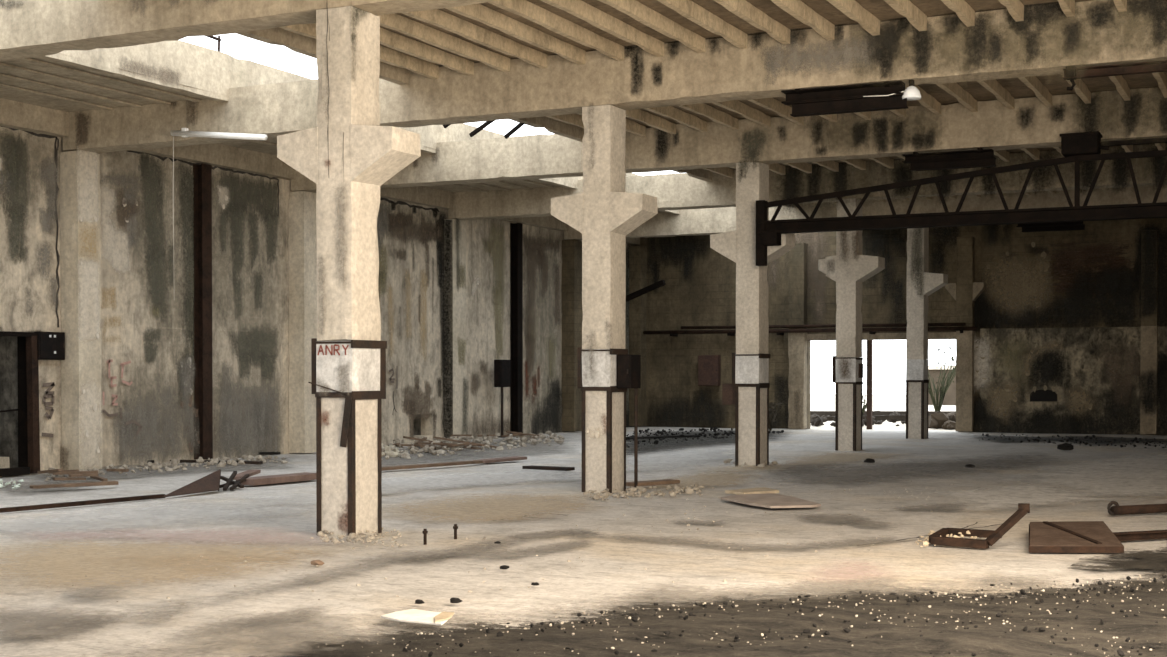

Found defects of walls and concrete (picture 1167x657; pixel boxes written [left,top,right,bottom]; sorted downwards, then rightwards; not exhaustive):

damp [625,45,662,93]
damp [751,0,1167,78]
damp [740,130,765,178]
damp [774,114,958,209]
damp [975,88,1167,195]
damp [0,134,58,304]
crack [1,126,60,327]
damp [102,155,195,462]
damp [377,202,511,438]
damp [973,348,1157,435]